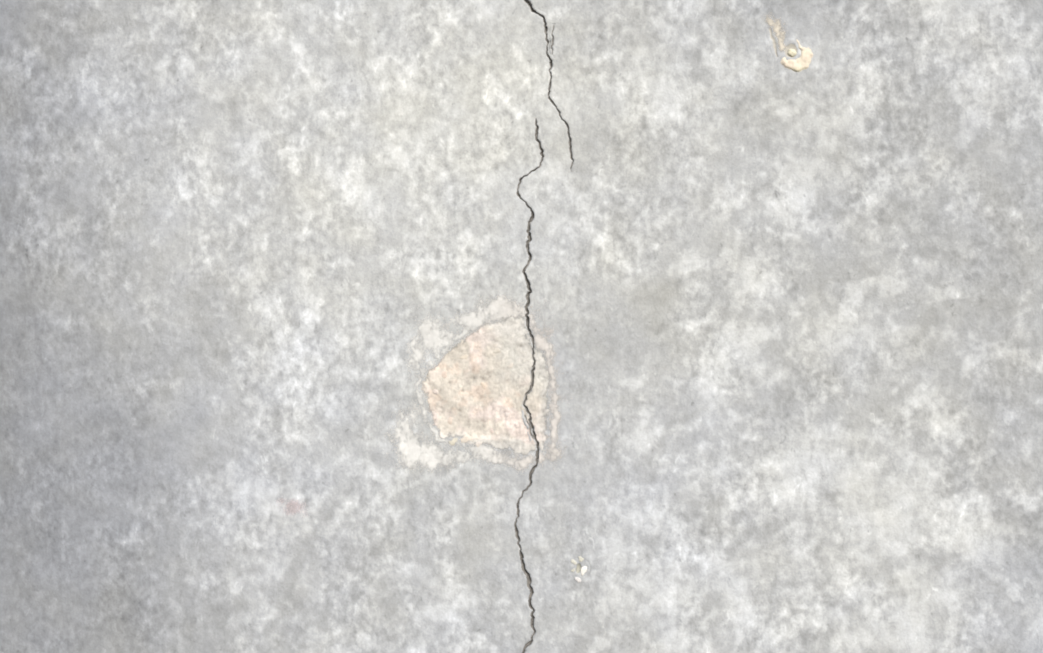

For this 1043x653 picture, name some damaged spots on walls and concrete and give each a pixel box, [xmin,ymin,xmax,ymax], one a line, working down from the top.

spalling [389,296,561,471]
crack [511,0,577,653]